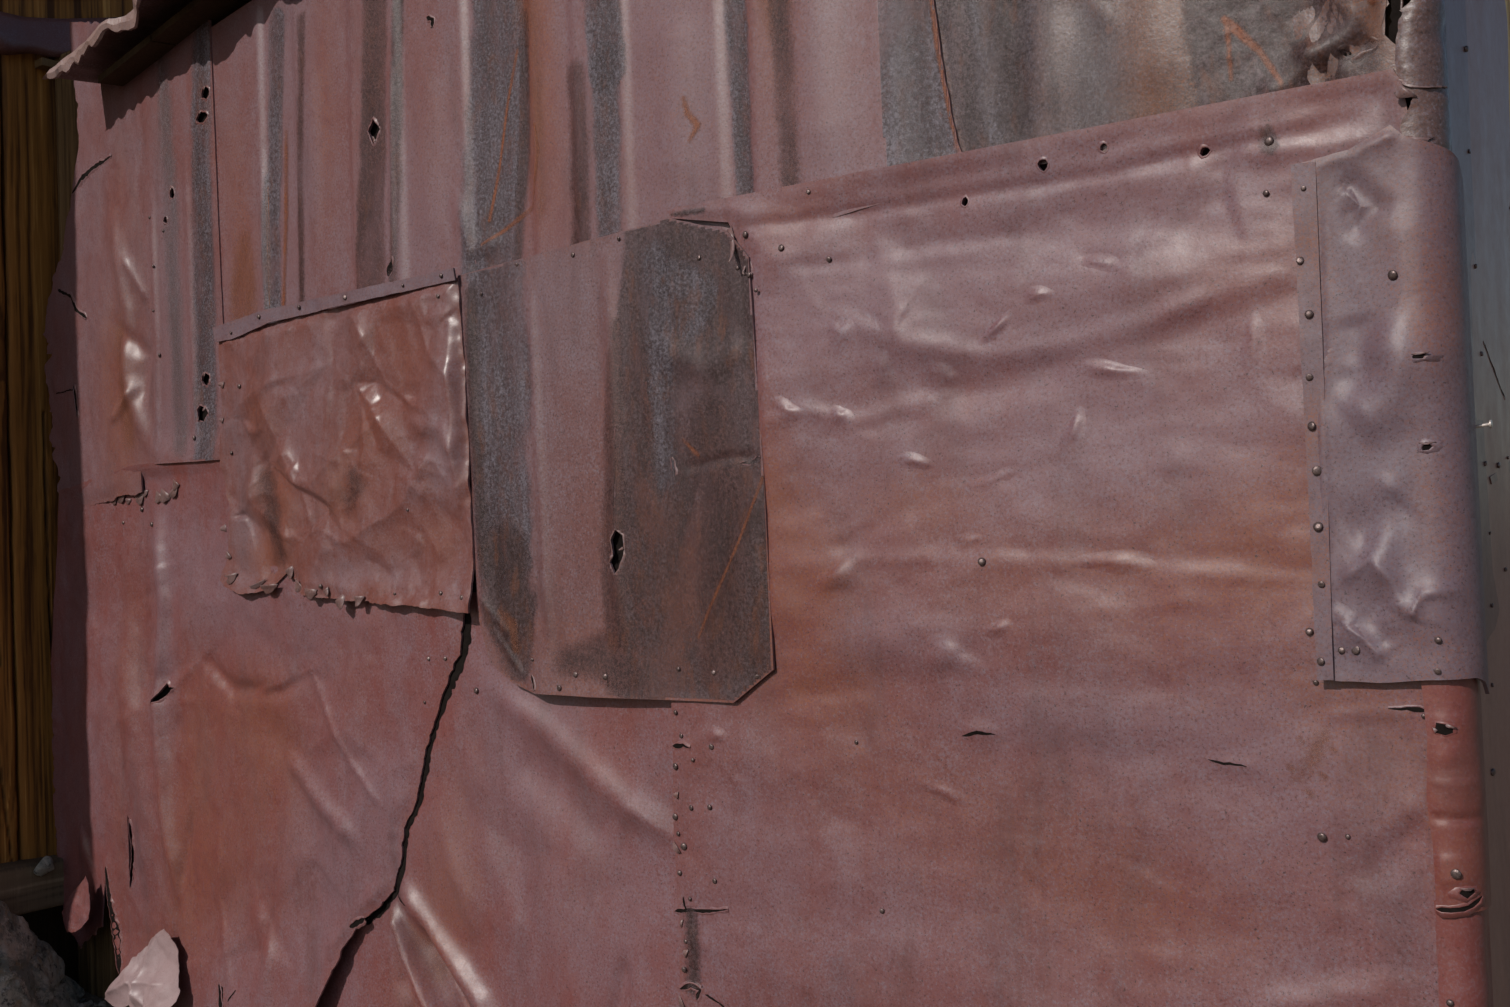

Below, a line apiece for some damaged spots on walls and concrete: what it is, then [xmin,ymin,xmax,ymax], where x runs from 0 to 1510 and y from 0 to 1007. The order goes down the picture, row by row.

corrosion [356,0,386,288]
corrosion [601,321,628,696]
crack [365,613,471,925]